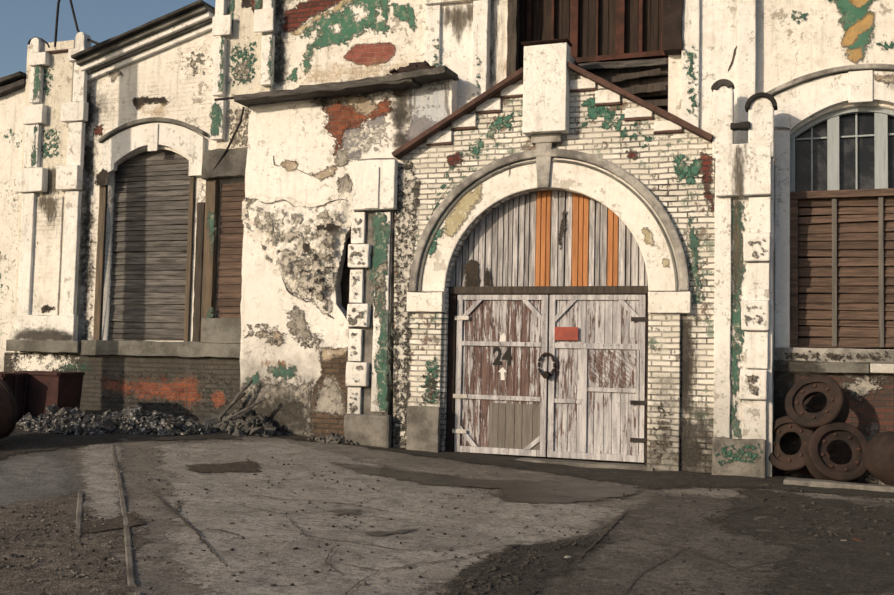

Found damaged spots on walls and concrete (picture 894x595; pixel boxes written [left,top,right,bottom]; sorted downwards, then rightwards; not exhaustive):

peeling [181,36,250,92]
flaking render [281,0,370,33]
flaking render [343,42,396,67]
peeling [380,0,417,32]
damp [444,2,473,40]
peeling [841,11,874,63]
damp [38,167,60,224]
flaking render [92,96,440,447]
peeling [784,350,890,362]
flaking render [840,373,889,401]